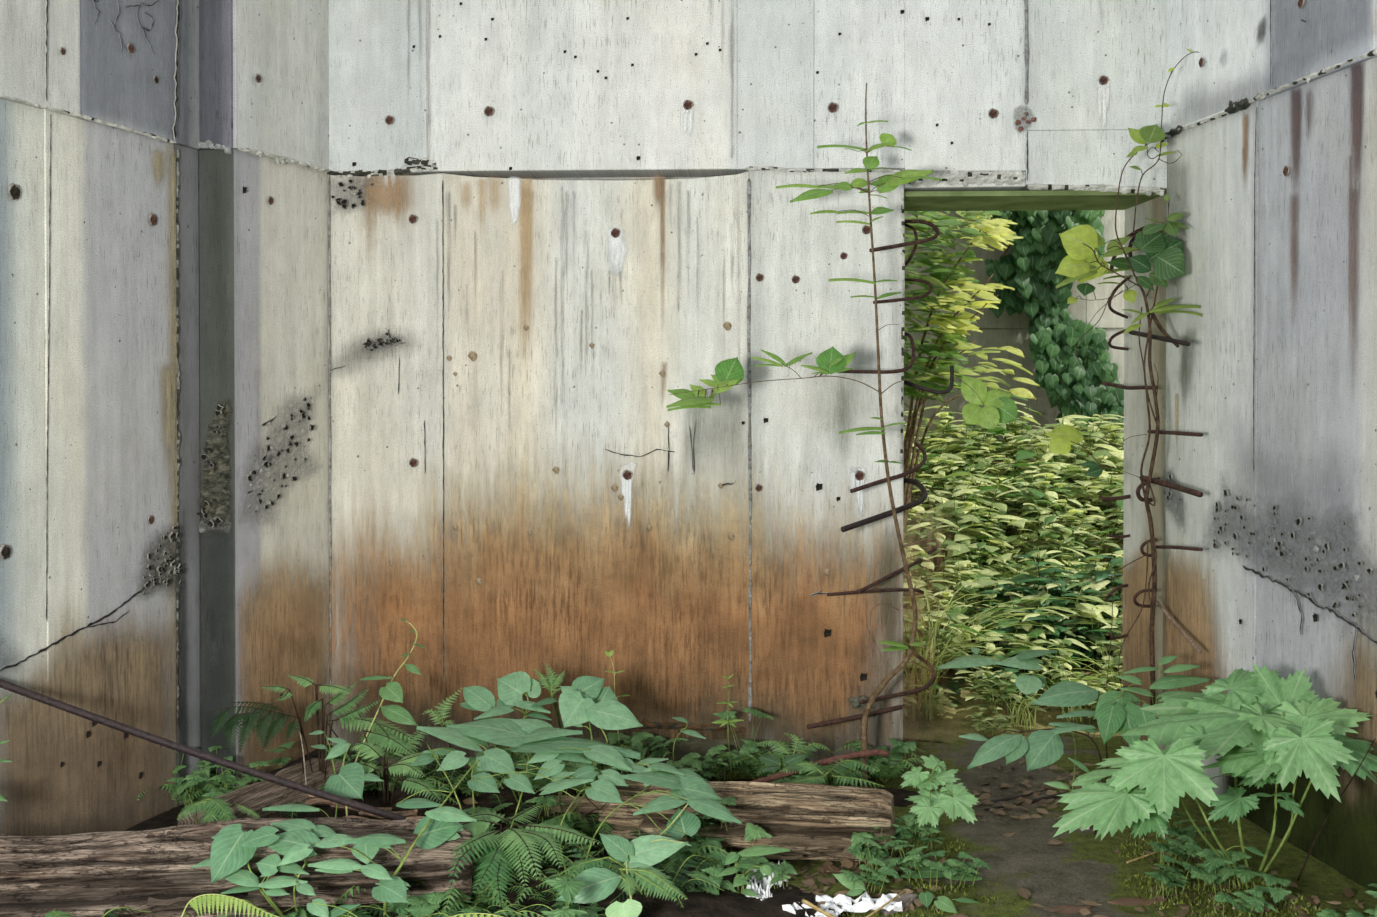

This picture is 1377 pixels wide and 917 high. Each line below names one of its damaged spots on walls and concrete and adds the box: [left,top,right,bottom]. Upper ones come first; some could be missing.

rust [1283,90,1310,176]
spalling [327,157,438,209]
rust [655,177,664,265]
rust [1349,64,1362,337]
crack [0,0,180,671]
spalling [363,332,401,351]
spalling [196,397,315,533]
efflorescence [618,462,636,525]
efflorescence [850,468,865,513]
spalling [142,526,183,595]
spalling [1098,471,1377,626]
rust [1122,543,1220,707]